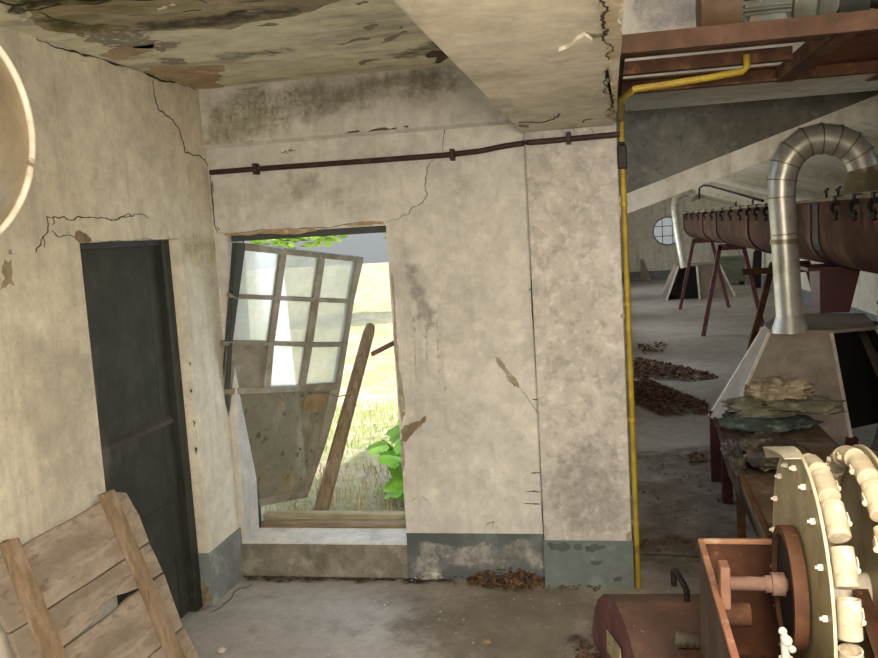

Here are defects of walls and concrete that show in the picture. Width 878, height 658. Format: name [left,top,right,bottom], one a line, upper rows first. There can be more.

crack [0,0,154,25]
spalling [19,0,341,89]
damp [394,42,440,58]
peeling [425,50,449,64]
crack [582,0,615,133]
damp [215,70,441,143]
crack [36,39,361,233]
crack [390,129,445,221]
crack [36,213,178,252]
peeling [0,250,14,289]
peeling [414,539,544,574]
peeling [547,542,606,566]